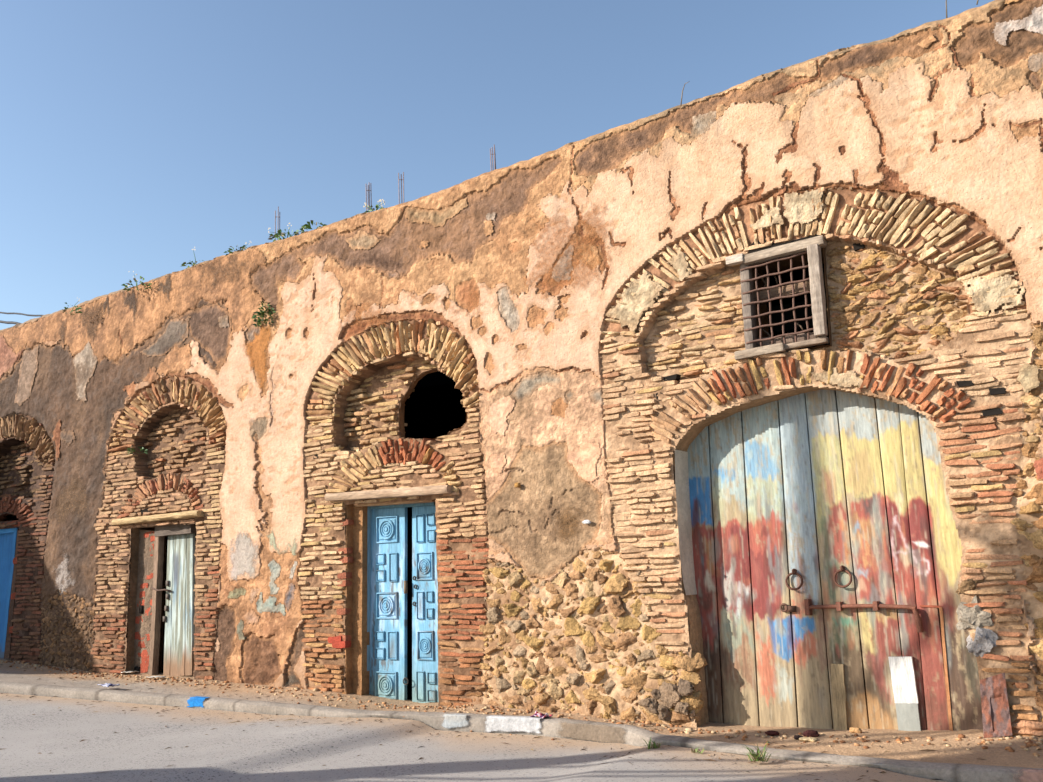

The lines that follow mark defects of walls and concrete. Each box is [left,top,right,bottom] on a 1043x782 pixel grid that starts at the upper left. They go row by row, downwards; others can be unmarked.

crack [729,59,909,200]
crack [929,24,1043,153]
spalling [0,0,1043,621]
spalling [214,433,306,688]